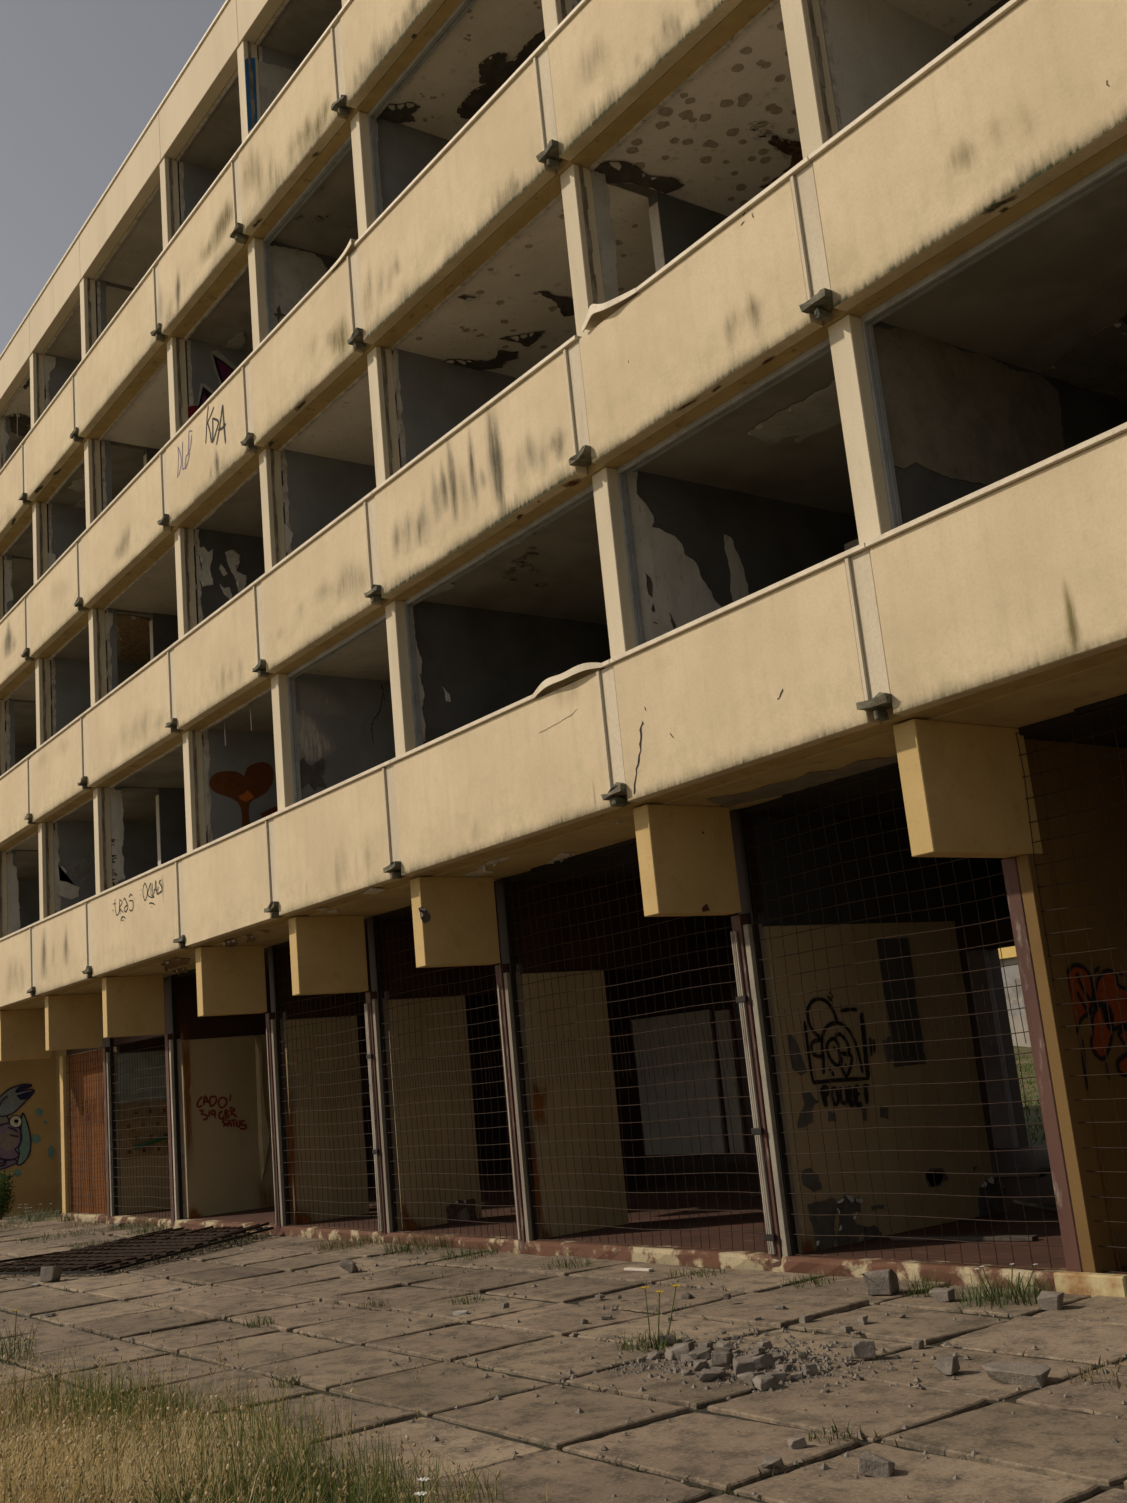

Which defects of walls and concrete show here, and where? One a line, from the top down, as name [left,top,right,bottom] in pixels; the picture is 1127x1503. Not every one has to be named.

spalling [457,28,546,119]
spalling [759,135,803,188]
water stain [489,434,501,492]
flaking render [197,547,247,599]
flaking render [627,471,749,642]